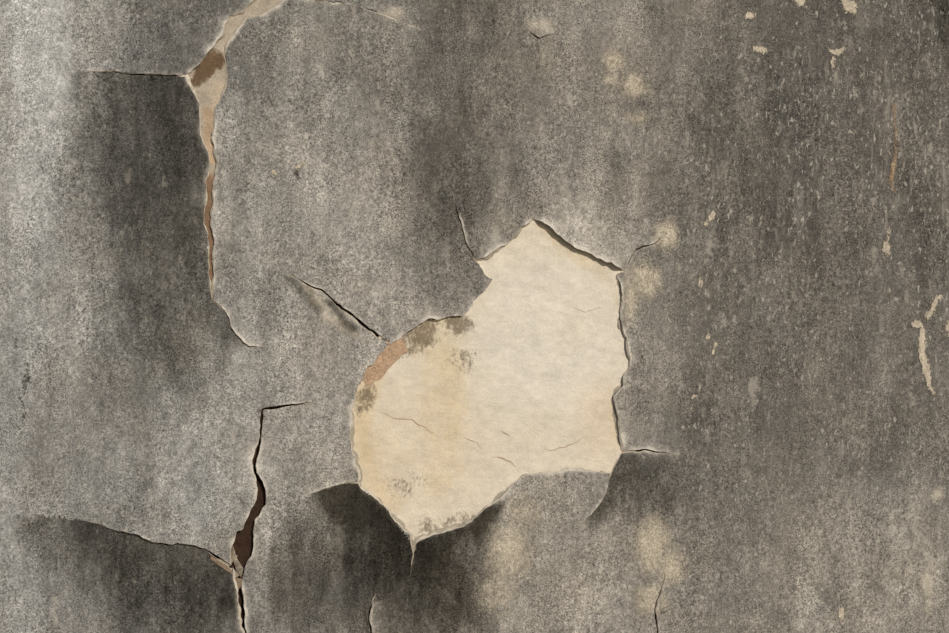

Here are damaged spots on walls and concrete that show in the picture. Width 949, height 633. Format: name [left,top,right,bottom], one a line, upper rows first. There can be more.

spalling [828,46,846,69]
spalling [841,0,857,16]
peeling [176,0,321,304]
crack [284,268,388,345]
damp [403,316,473,354]
peeling [333,206,645,553]
spalling [911,294,942,395]
crack [90,392,313,633]
crack [302,471,356,496]
damp [318,483,537,632]